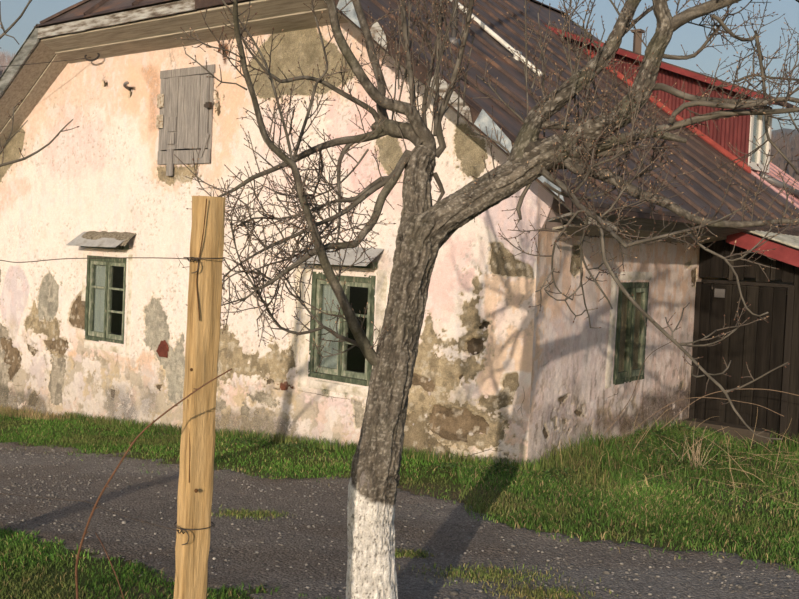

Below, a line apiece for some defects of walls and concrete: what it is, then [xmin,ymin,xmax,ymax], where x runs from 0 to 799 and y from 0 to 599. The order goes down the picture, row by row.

peeling [248,27,355,105]
peeling [375,135,403,180]
peeling [454,124,488,180]
peeling [0,272,85,408]
flaking render [143,297,185,409]
peeling [216,323,297,418]
peeling [407,243,534,465]